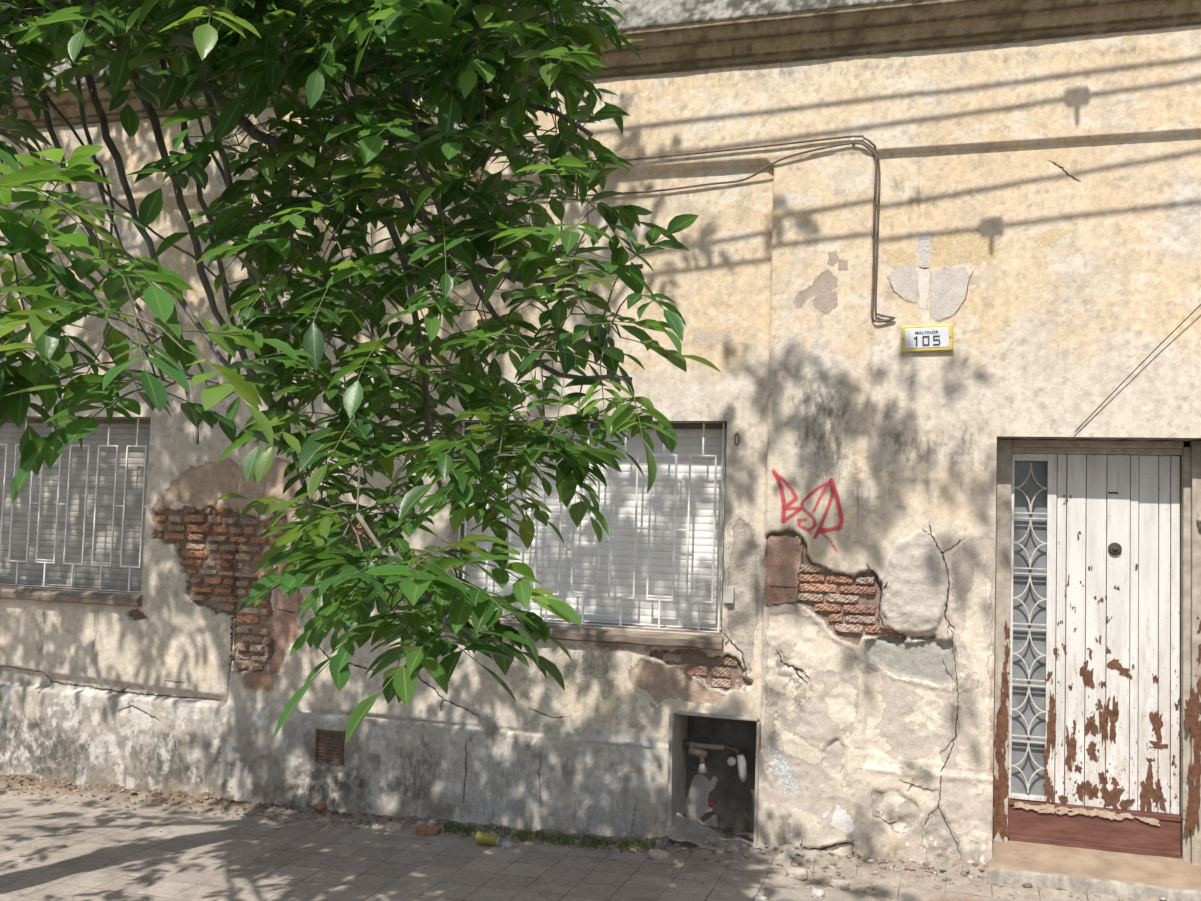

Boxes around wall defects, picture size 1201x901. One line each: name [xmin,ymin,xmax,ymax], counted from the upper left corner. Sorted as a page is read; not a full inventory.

peeling [793,251,848,314]
peeling [882,226,1002,320]
spalling [150,457,318,676]
peeling [496,512,1201,864]
crack [876,525,965,855]
leakage [0,718,98,774]
leakage [144,742,202,784]